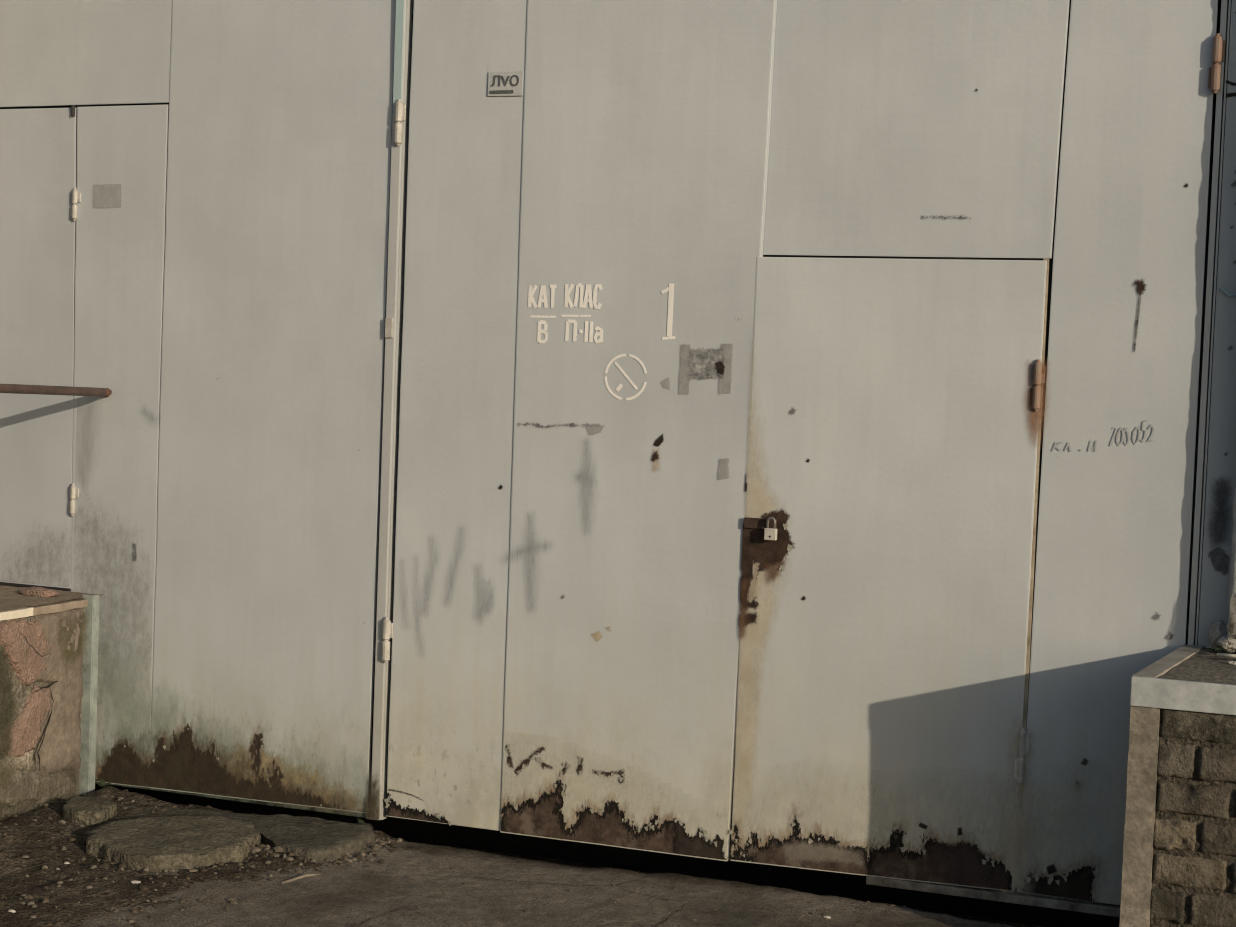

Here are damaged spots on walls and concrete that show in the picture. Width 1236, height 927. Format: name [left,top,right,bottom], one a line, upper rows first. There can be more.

rust [1134,280,1146,352]
rust [1029,365,1045,434]
rust [651,434,664,462]
rust [735,475,795,855]
rust [95,723,361,812]
peeling [384,793,455,826]
peeling [501,744,1096,901]